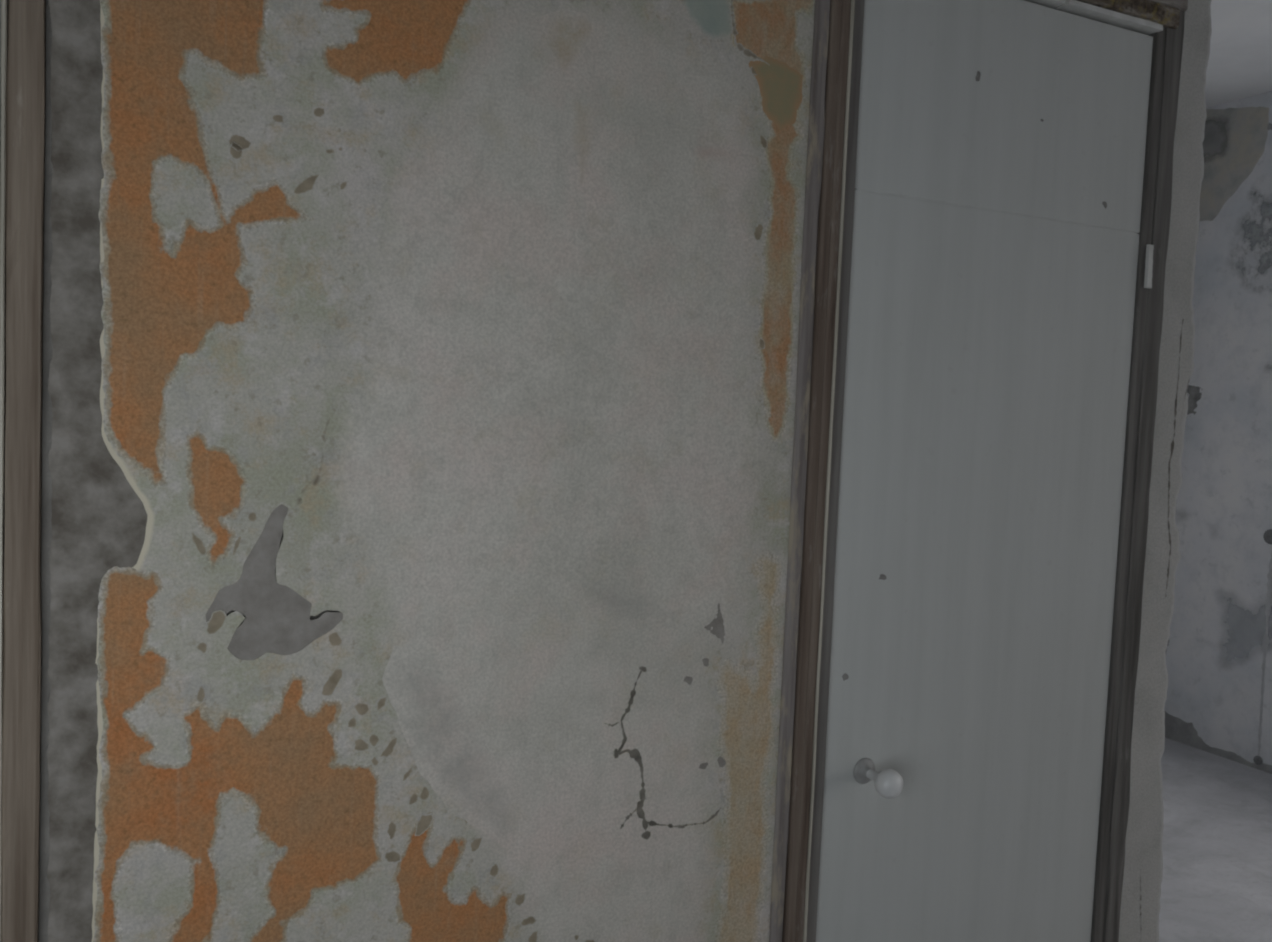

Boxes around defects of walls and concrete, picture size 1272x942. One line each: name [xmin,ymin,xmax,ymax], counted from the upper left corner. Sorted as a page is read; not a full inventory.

peeling [229,133,252,160]
peeling [293,174,320,195]
peeling [1199,107,1269,221]
leakage [1242,193,1272,274]
flaking render [47,0,148,942]
flaking render [196,504,343,660]
flaking render [704,603,725,643]
peeling [321,668,343,696]
peeling [347,696,398,766]
crack [604,666,722,840]
peeling [402,767,433,836]
peeling [514,893,539,942]